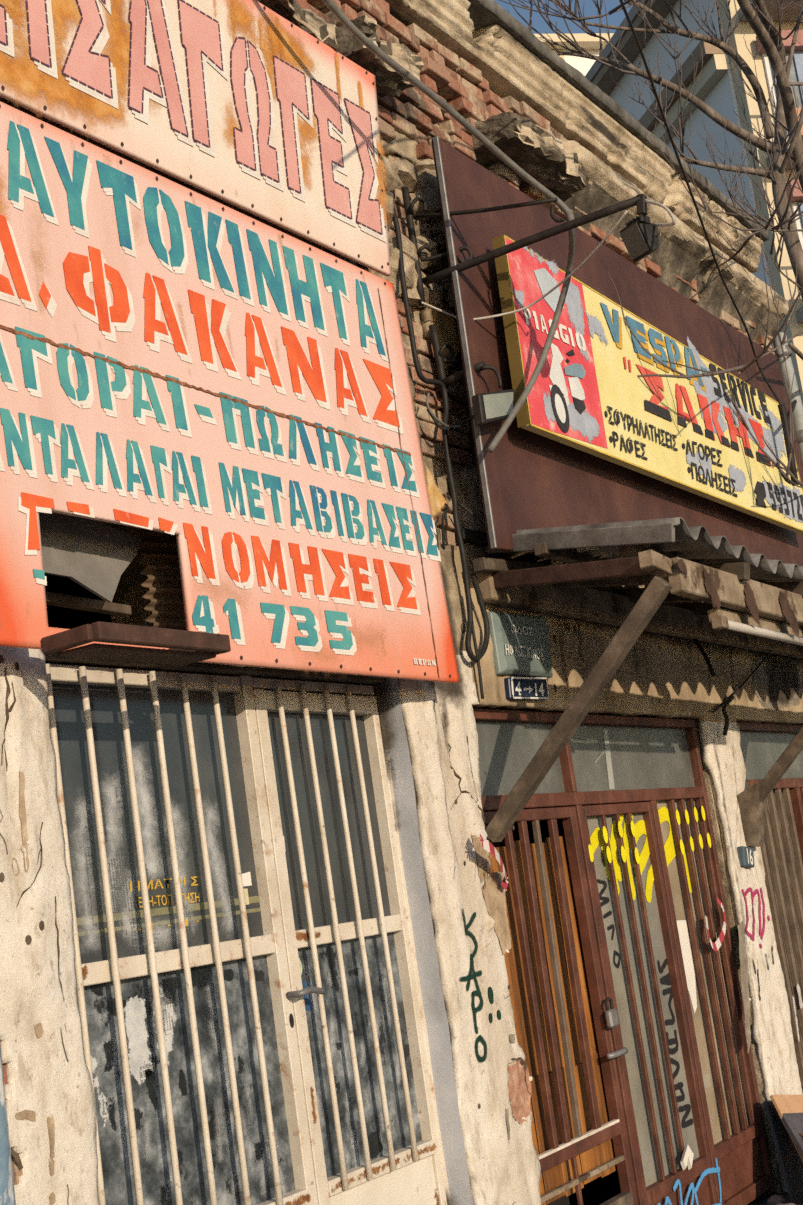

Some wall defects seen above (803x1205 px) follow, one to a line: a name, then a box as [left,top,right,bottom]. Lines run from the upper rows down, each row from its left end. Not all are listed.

crack [2,667,16,771]
crack [434,698,489,889]
crack [17,822,69,1062]
flaking render [12,1159,23,1185]
peeling [15,1110,56,1176]
rust [286,1194,311,1205]
peeling [505,1060,533,1144]